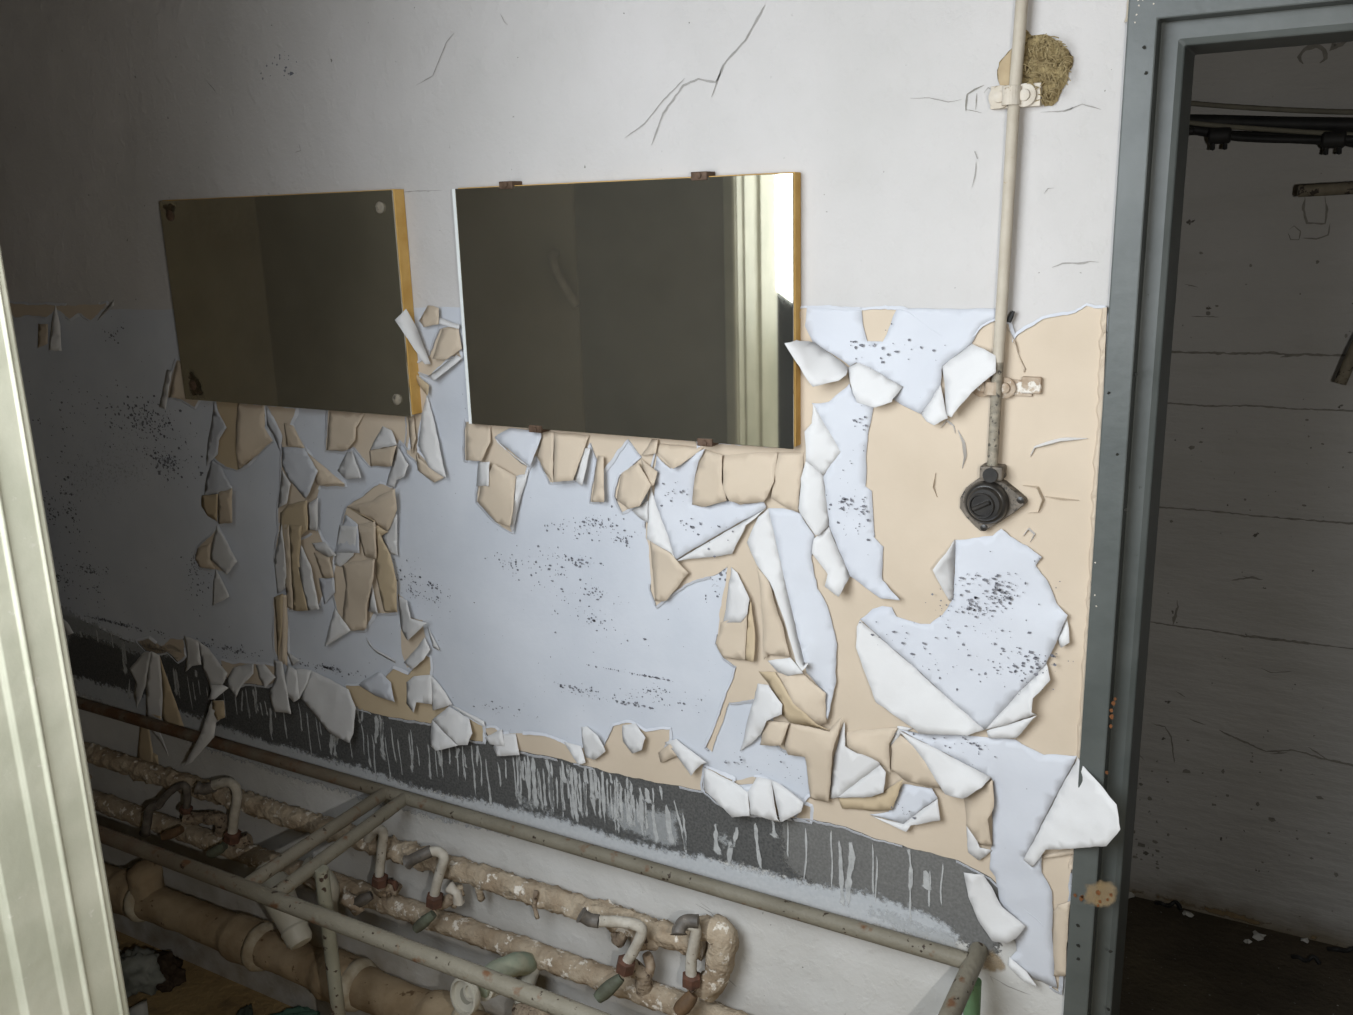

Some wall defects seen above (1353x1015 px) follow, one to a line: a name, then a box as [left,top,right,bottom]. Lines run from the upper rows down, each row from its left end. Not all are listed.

crack [625,5,765,143]
peeling [10,300,114,351]
damp [32,379,203,721]
damp [484,545,647,642]
damp [544,505,635,548]
peeling [129,303,1170,995]
damp [826,495,870,545]
damp [167,664,958,943]